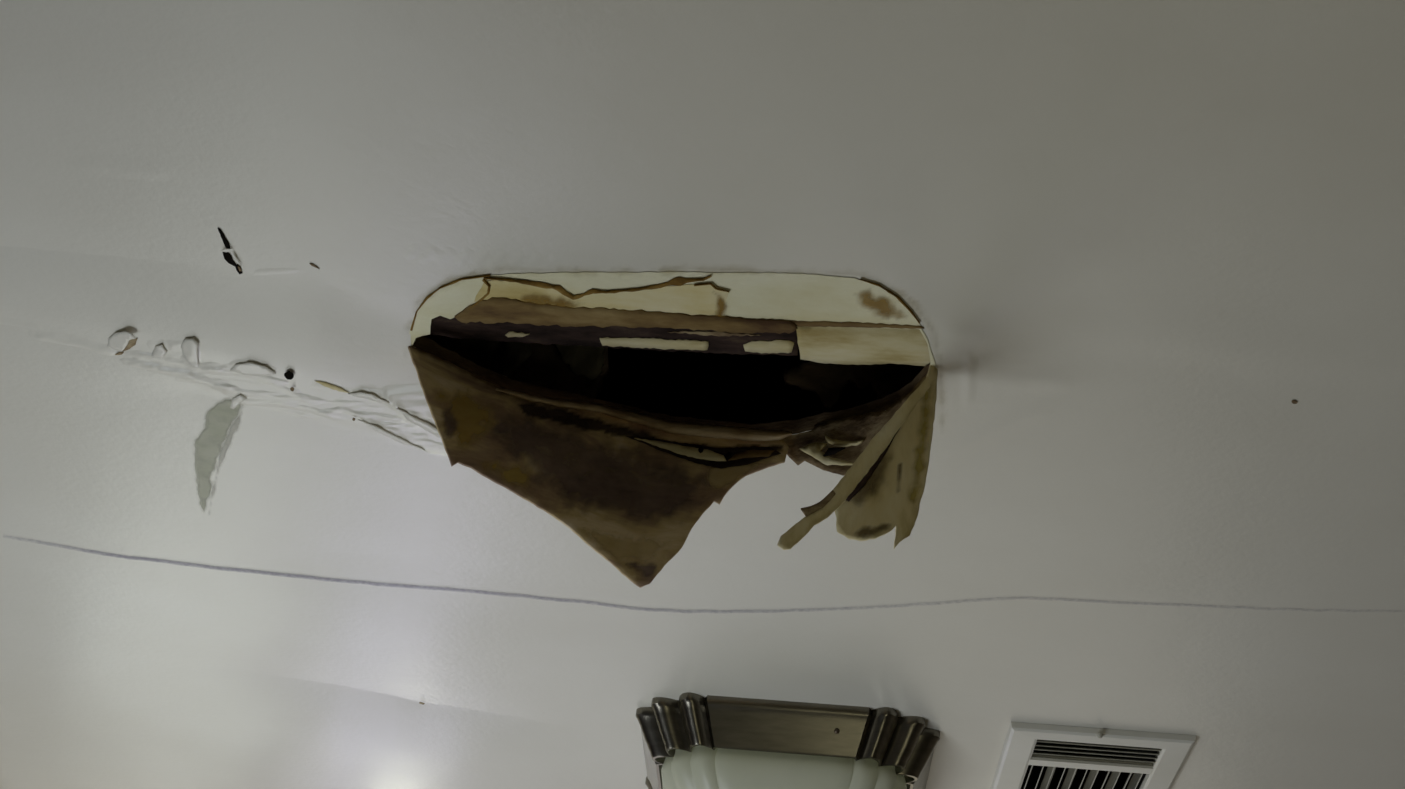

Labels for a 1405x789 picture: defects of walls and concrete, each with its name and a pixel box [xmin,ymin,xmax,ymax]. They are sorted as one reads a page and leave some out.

crack [218,228,320,275]
peeling [107,331,138,355]
peeling [409,272,936,434]
peeling [348,392,441,451]
water stain [439,394,783,519]
water stain [855,389,929,501]
water stain [857,525,888,537]